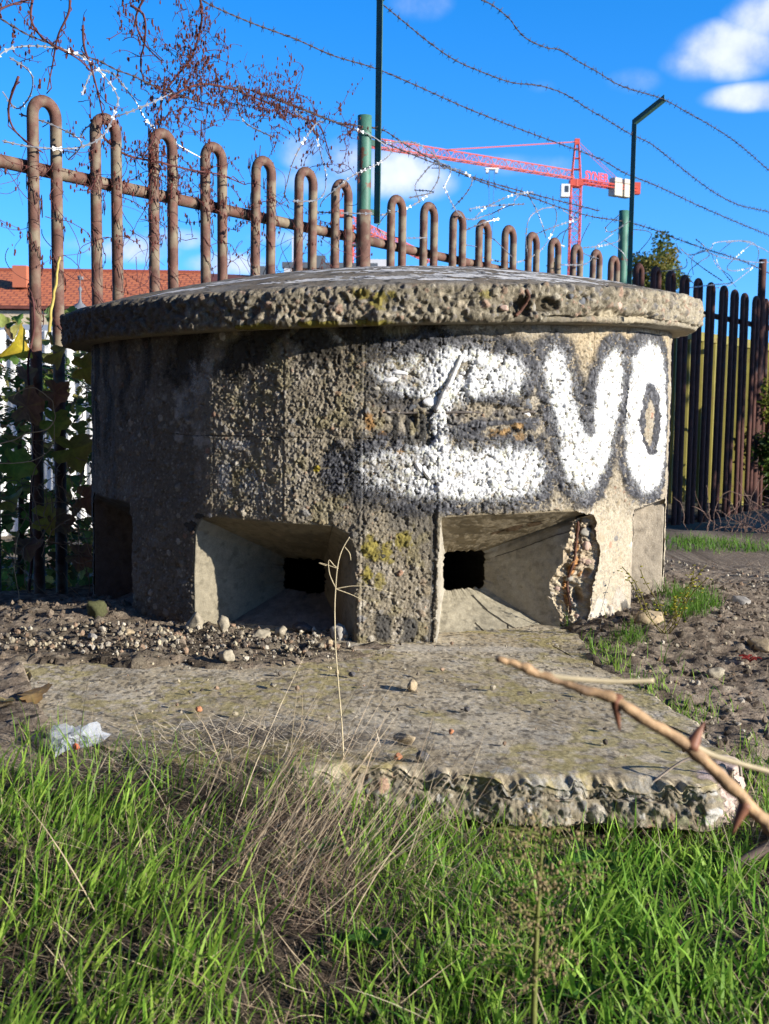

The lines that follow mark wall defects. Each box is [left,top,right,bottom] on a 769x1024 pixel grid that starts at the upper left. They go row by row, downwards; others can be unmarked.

rust [562,541,582,608]
spalling [545,514,601,626]